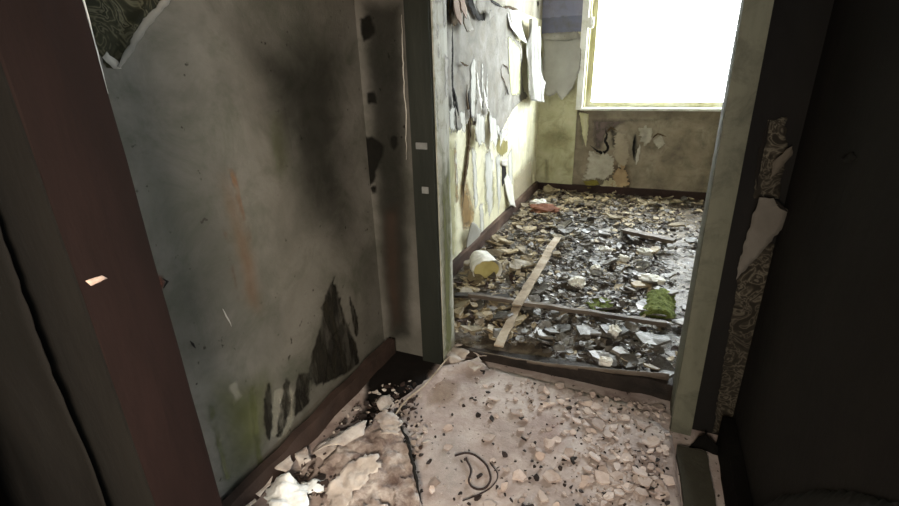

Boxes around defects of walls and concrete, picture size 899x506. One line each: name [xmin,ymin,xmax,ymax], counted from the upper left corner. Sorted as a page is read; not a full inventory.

spalling [436,0,494,37]
peeling [507,9,527,95]
peeling [449,59,516,248]
peeling [579,112,630,195]
peeling [638,125,665,149]
damp [252,277,359,439]